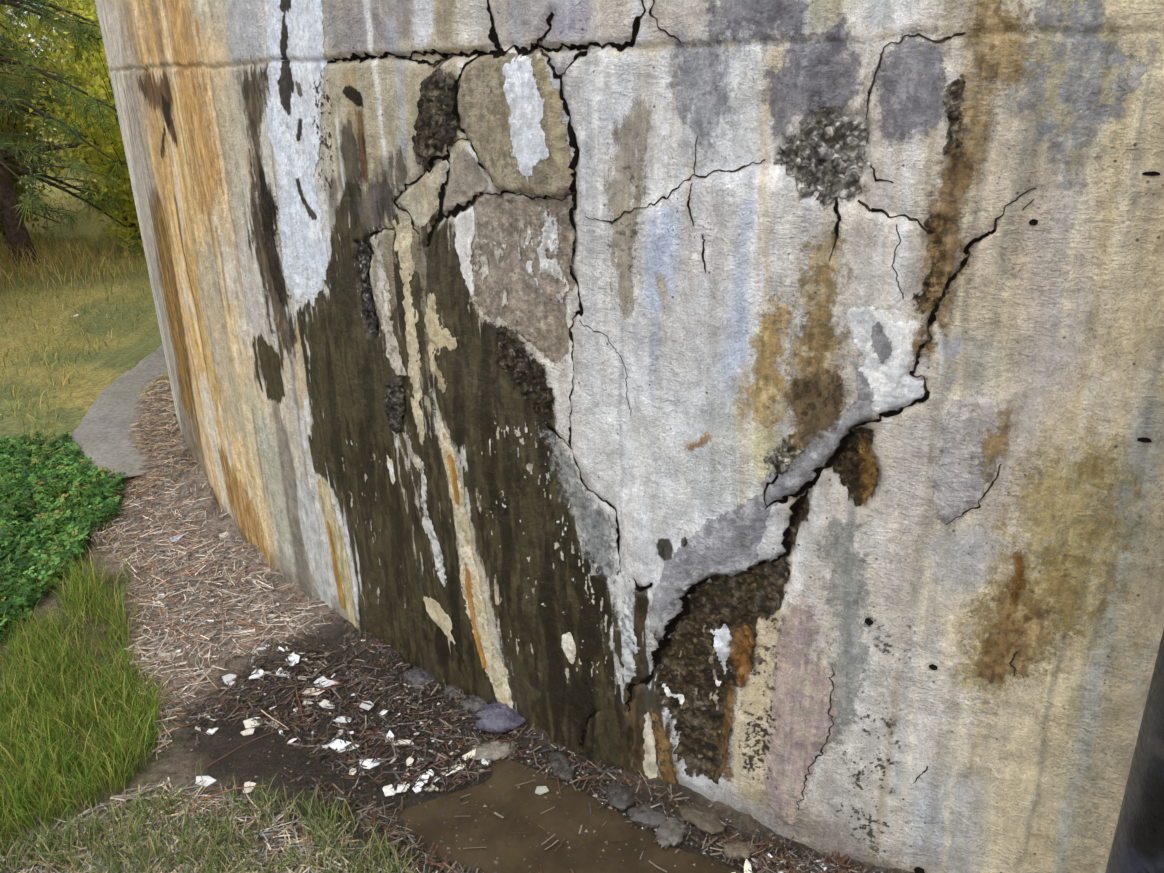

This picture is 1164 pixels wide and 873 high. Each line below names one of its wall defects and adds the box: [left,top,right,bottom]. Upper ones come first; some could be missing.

corrosion [152,193,194,423]
corrosion [293,476,359,629]
peeling [383,784,396,797]
leakage [239,61,678,783]
spalling [353,54,641,683]
crack [327,0,765,592]
crack [579,575,717,749]
spalling [648,215,953,853]
crack [829,165,931,299]
crack [749,188,1036,572]
corrosion [912,0,1033,359]
corrosion [954,425,1149,713]